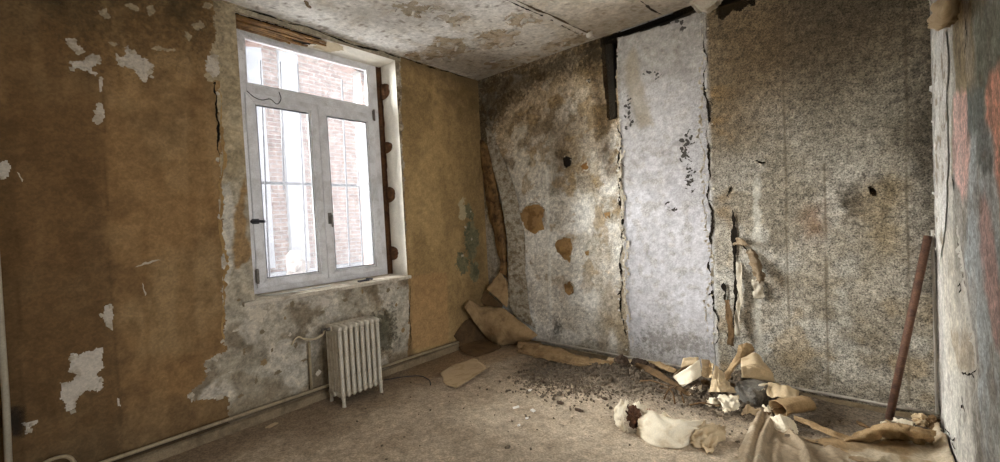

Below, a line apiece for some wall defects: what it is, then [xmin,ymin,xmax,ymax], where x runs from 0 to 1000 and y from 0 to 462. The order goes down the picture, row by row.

peeling [125,3,156,16]
peeling [65,38,105,125]
peeling [108,41,175,82]
crack [212,82,220,155]
peeling [184,0,598,423]
water stain [455,197,480,283]
peeling [604,0,723,371]
crack [695,20,747,353]
water stain [372,303,398,350]
peeling [60,347,104,414]